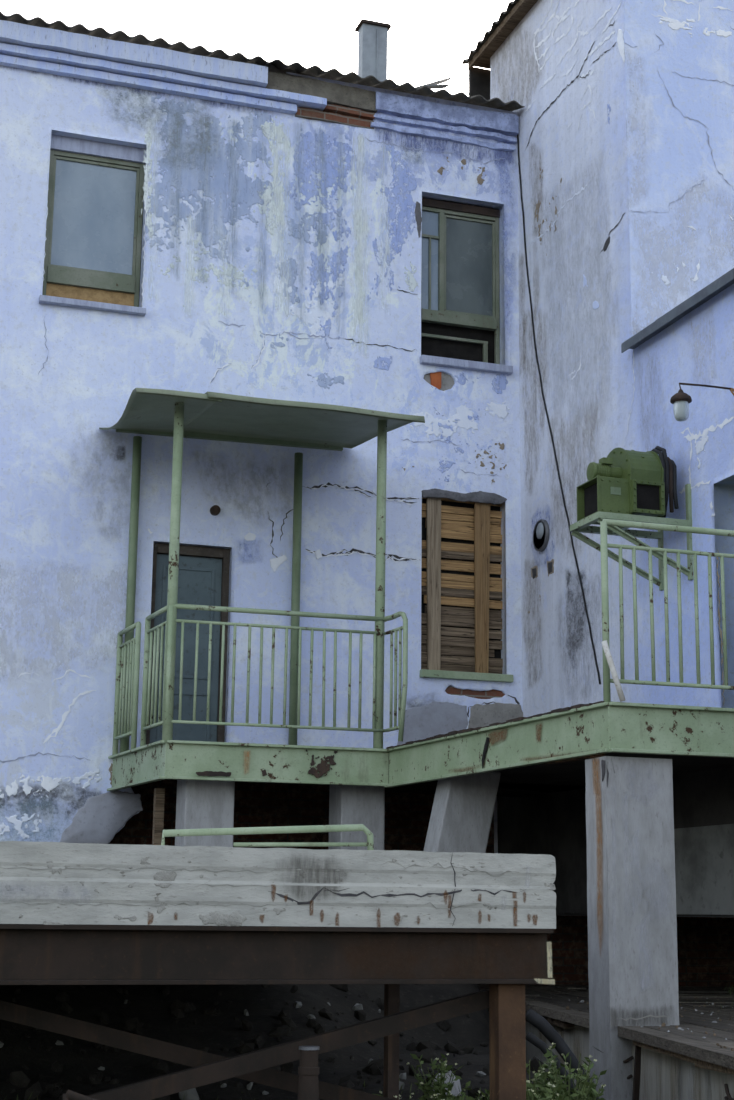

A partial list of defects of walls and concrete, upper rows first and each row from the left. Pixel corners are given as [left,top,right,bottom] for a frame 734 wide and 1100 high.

crack [599,0,734,254]
peeling [141,95,359,352]
peeling [367,144,422,302]
peeling [410,372,510,485]
crack [268,482,419,557]
crack [306,548,420,563]
peeling [0,763,113,799]
corrosion [306,749,338,778]
peeling [0,813,42,839]
corrosion [525,753,602,941]
crack [0,853,524,924]
corrosion [513,892,537,926]